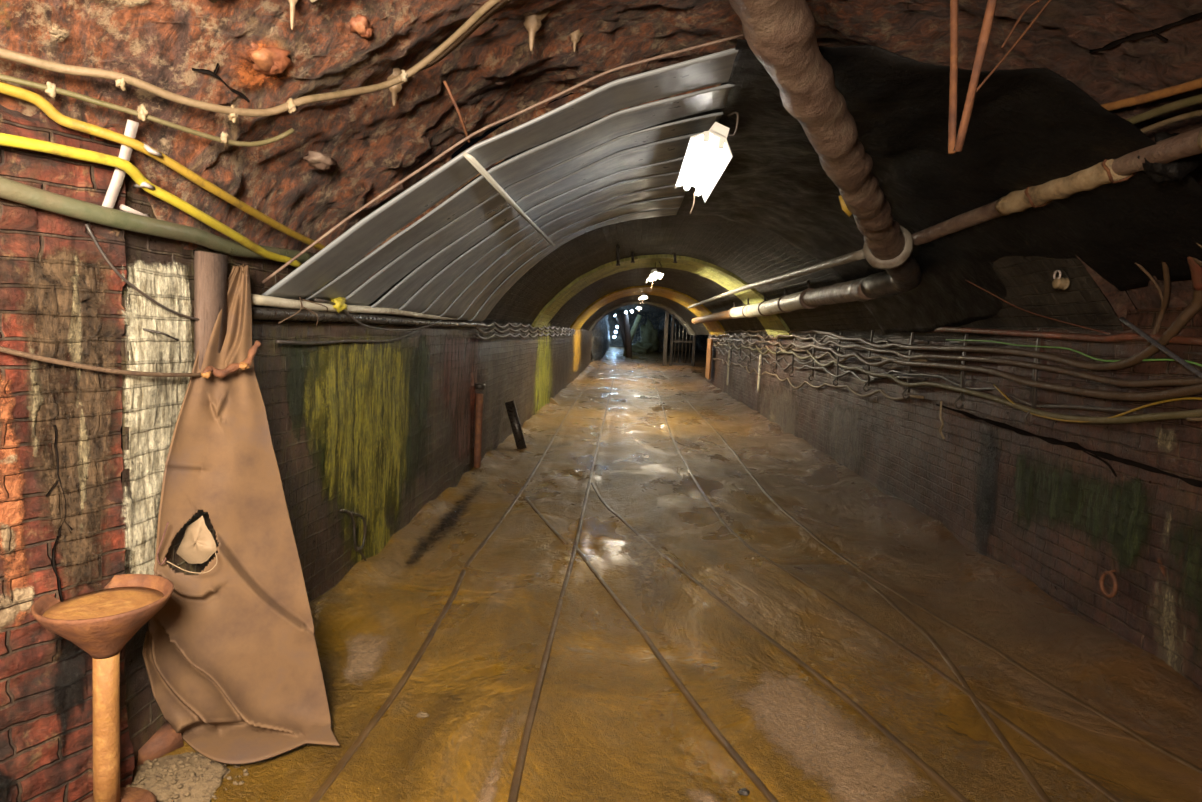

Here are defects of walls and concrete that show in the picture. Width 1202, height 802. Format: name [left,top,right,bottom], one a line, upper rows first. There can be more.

water stain [282,336,430,556]
crack [936,404,1202,488]
water stain [1154,588,1182,672]